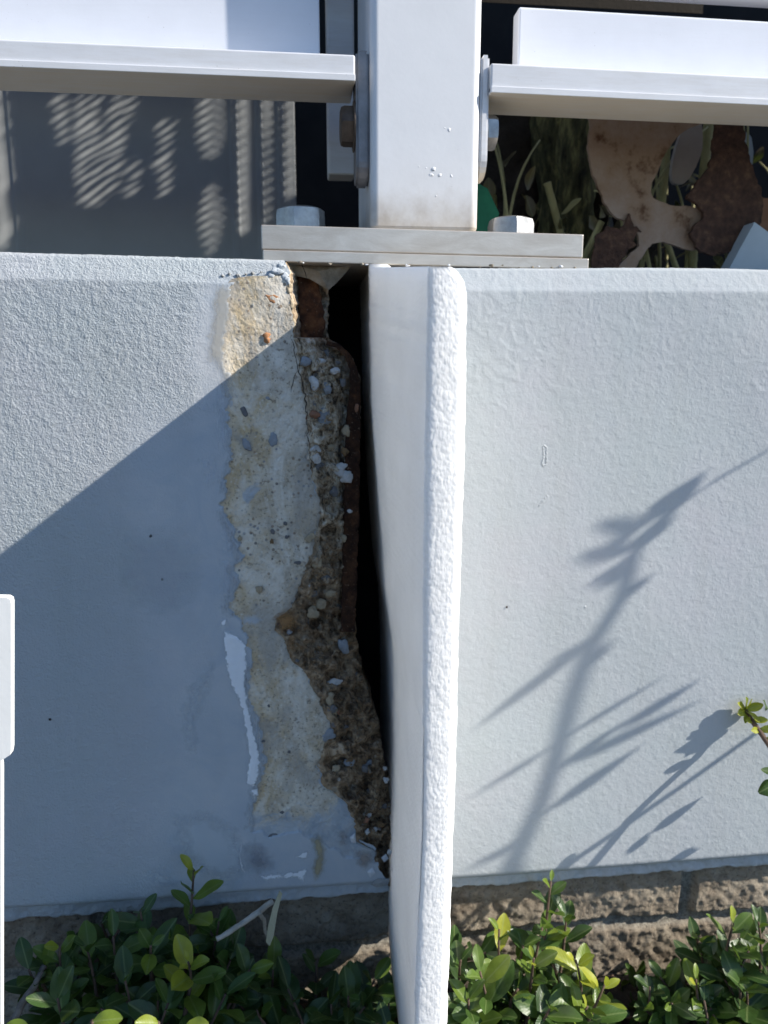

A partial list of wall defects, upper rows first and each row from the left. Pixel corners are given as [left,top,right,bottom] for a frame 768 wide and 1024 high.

spalling [212,262,391,887]
rust [298,277,361,632]